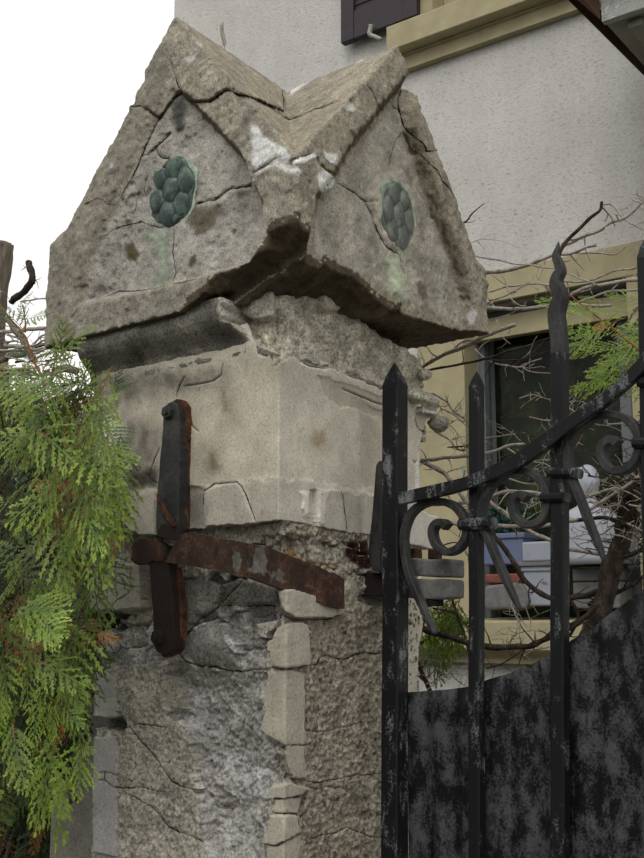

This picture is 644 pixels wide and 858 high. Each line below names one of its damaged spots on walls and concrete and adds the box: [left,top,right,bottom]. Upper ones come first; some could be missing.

crack [84,56,331,297]
crack [196,153,404,271]
crack [369,79,455,197]
spalling [185,211,437,442]
crack [187,580,341,634]
spalling [254,532,382,608]
crack [180,652,382,689]
crack [104,723,205,844]
crack [269,773,381,846]